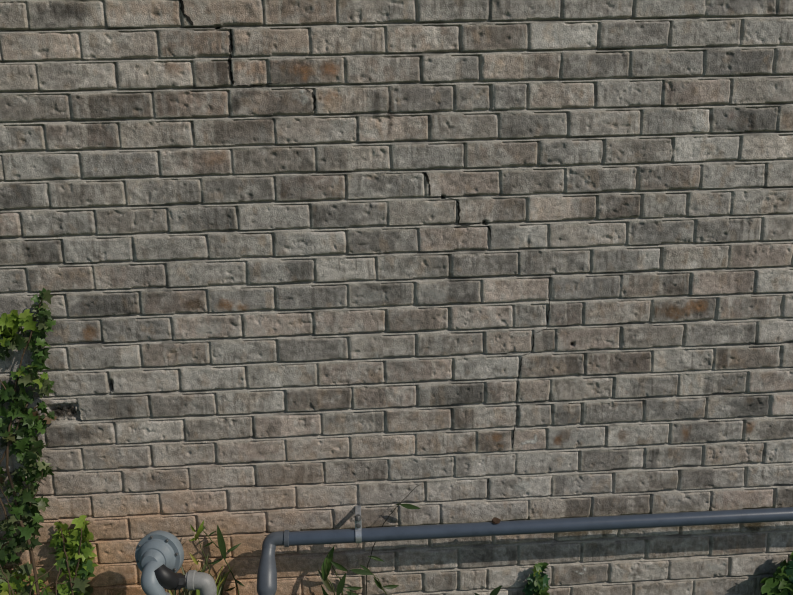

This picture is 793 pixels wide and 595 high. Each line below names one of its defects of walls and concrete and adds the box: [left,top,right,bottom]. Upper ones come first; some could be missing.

crack [180,0,316,111]
crack [423,172,492,240]
crack [512,275,551,448]